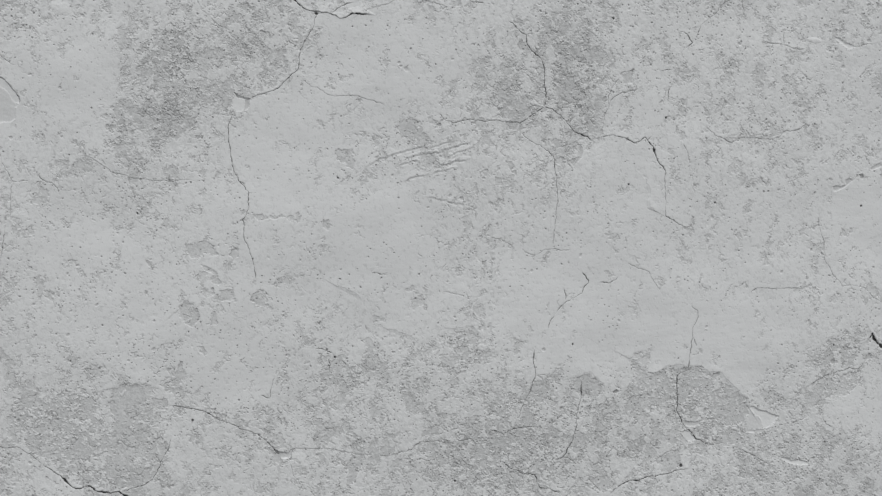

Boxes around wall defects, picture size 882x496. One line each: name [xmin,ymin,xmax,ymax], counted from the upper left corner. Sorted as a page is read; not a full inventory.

crack [253,0,394,103]
crack [440,21,681,255]
crack [2,440,171,496]
peeling [630,349,779,473]